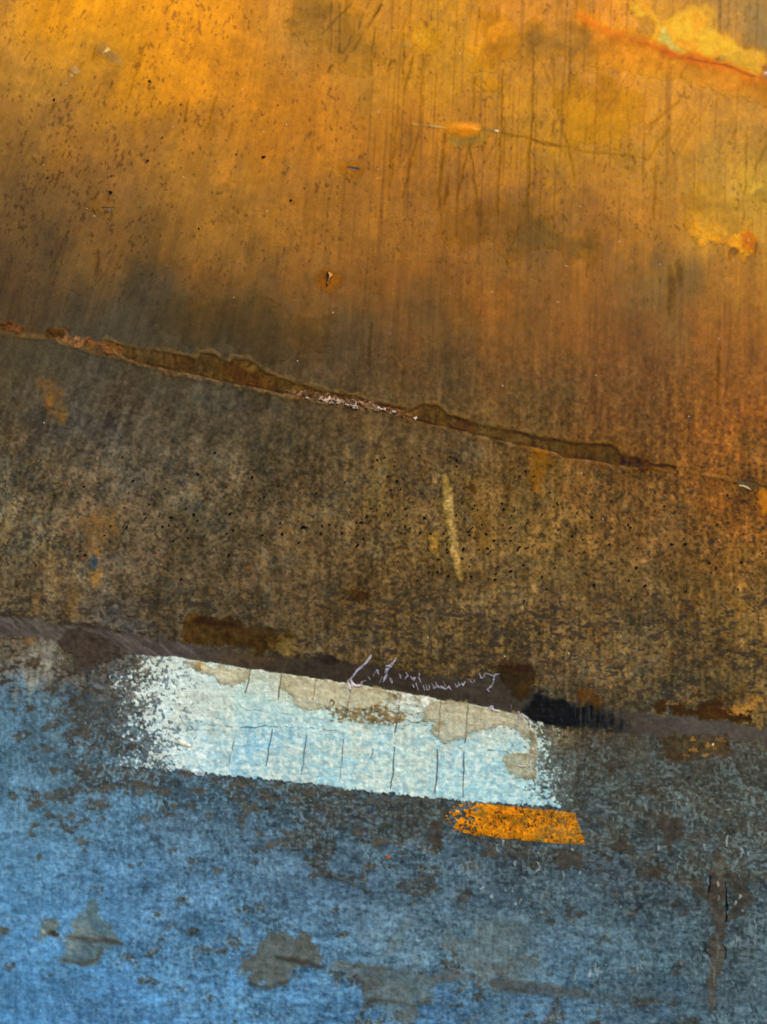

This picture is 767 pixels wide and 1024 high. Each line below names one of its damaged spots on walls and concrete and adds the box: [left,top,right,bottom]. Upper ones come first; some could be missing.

corrosion [681,180,759,263]
crack [0,318,741,482]
peeling [302,785,387,807]
peeling [34,894,128,968]
peeling [233,926,437,1009]